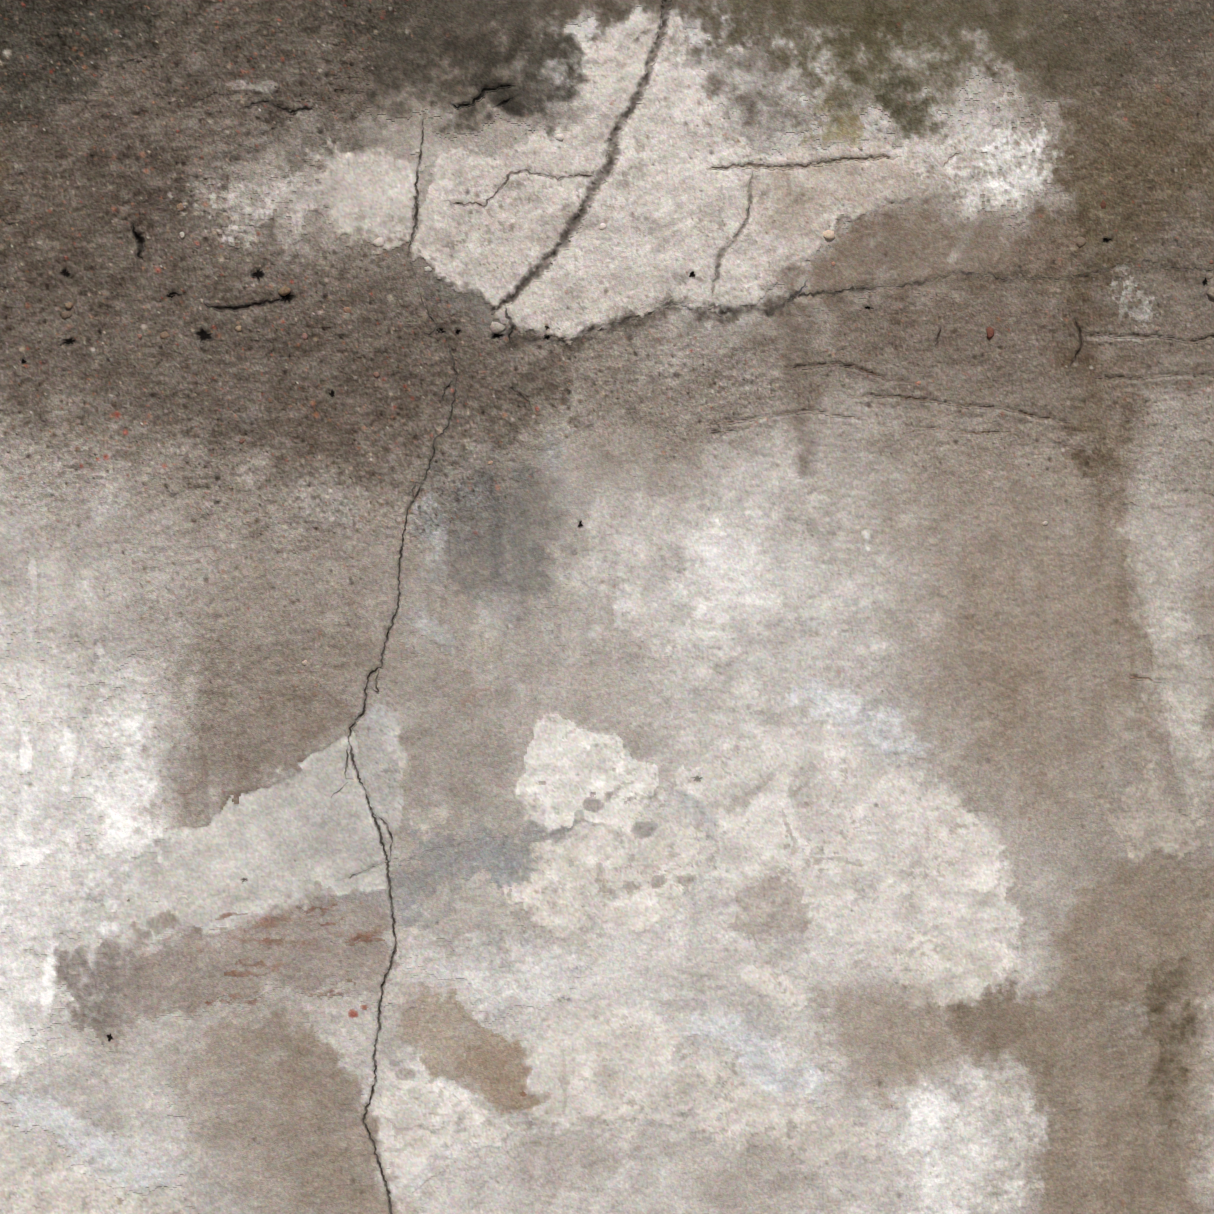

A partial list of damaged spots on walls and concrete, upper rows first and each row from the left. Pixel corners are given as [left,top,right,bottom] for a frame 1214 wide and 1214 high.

peeling [223,78,279,96]
spalling [250,267,267,282]
spalling [278,289,296,305]
leakage [771,63,1214,344]
leakage [0,47,850,1214]
crack [331,0,1214,1214]
leakage [769,401,1214,852]
flaking render [502,712,1038,1013]
leakage [682,839,1214,1214]